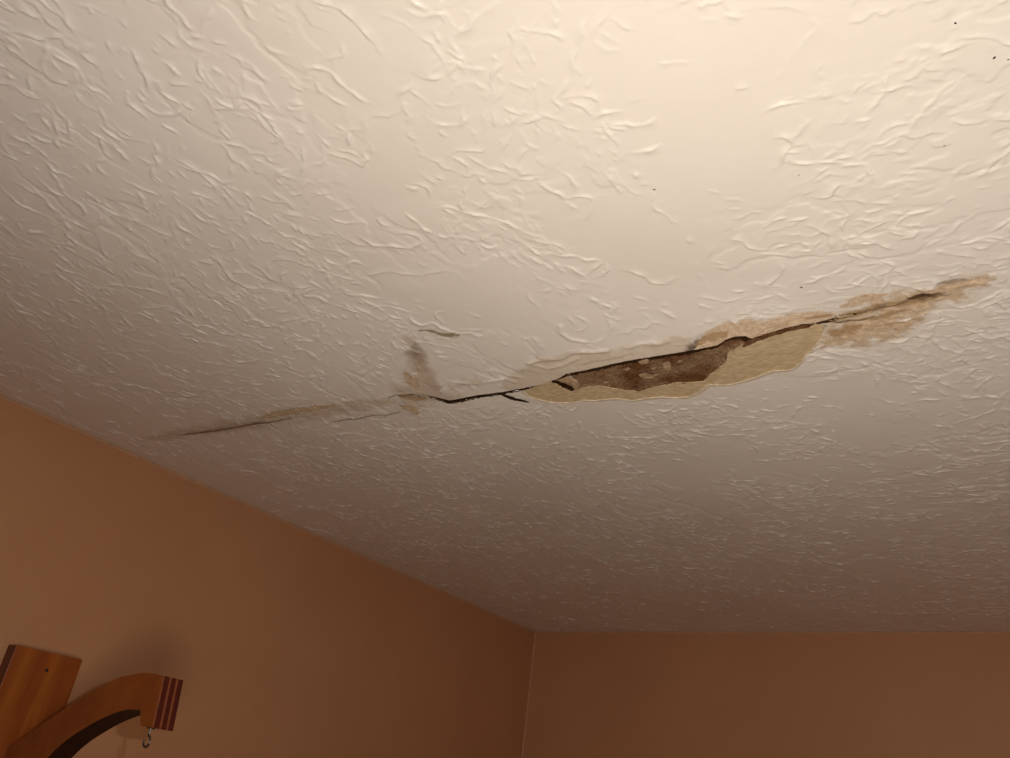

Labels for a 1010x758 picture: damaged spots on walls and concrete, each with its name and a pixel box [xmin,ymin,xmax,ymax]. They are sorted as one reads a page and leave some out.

leakage [694,277,995,350]
crack [330,296,928,423]
peeling [520,323,830,404]
crack [184,419,287,435]